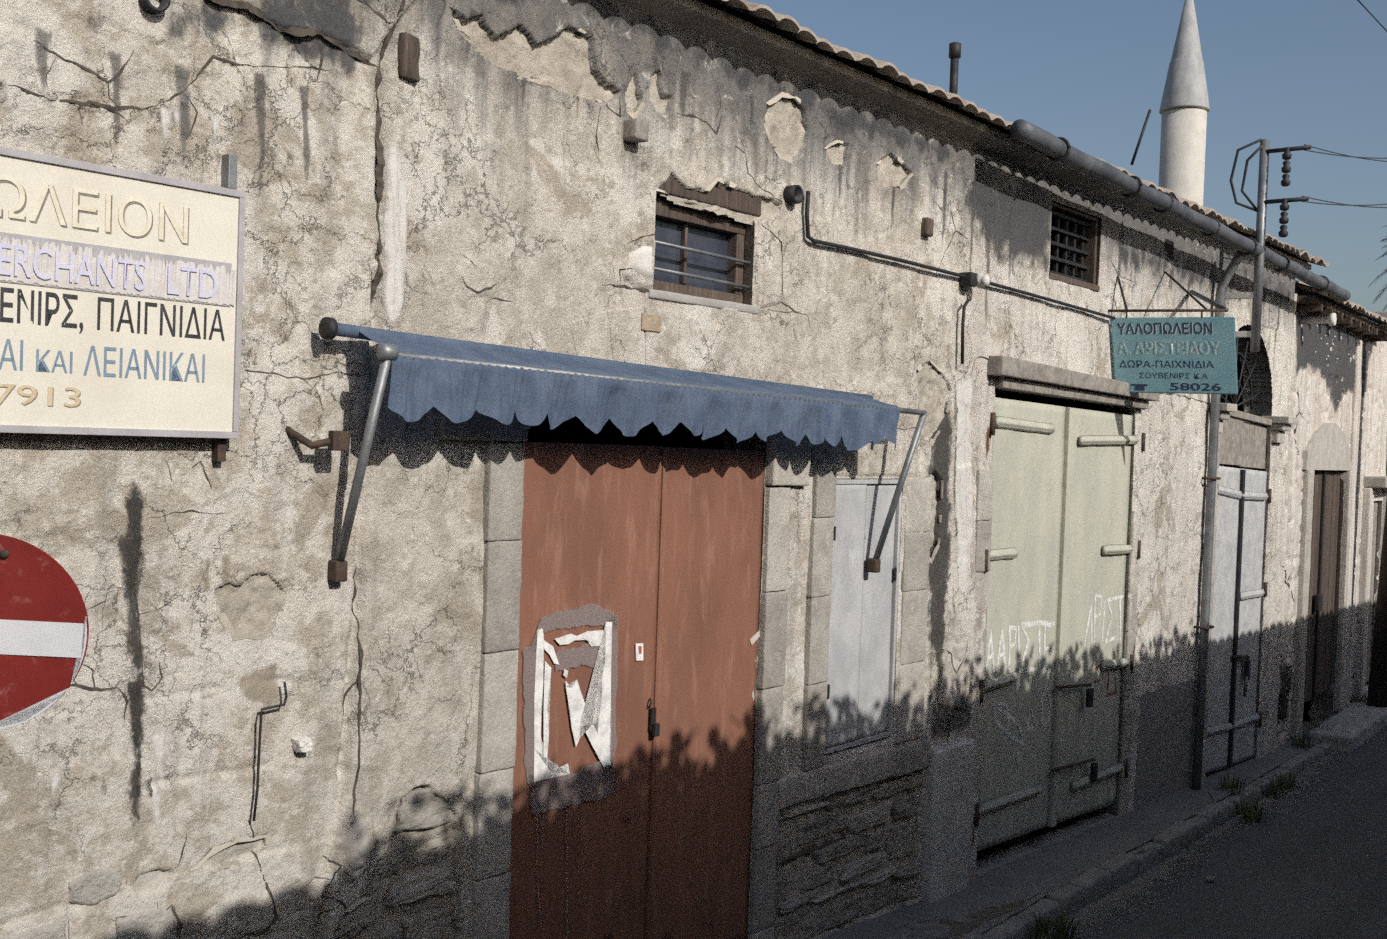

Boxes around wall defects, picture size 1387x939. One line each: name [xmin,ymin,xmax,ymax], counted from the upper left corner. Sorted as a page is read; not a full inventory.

leakage [589,0,669,49]
leakage [681,74,690,110]
crack [11,0,406,305]
leakage [725,59,949,233]
flaking render [660,177,778,225]
crack [71,587,183,721]
flaking render [191,833,271,871]
flaking render [68,867,169,906]
flaking render [0,920,66,939]
flaking render [115,907,176,939]